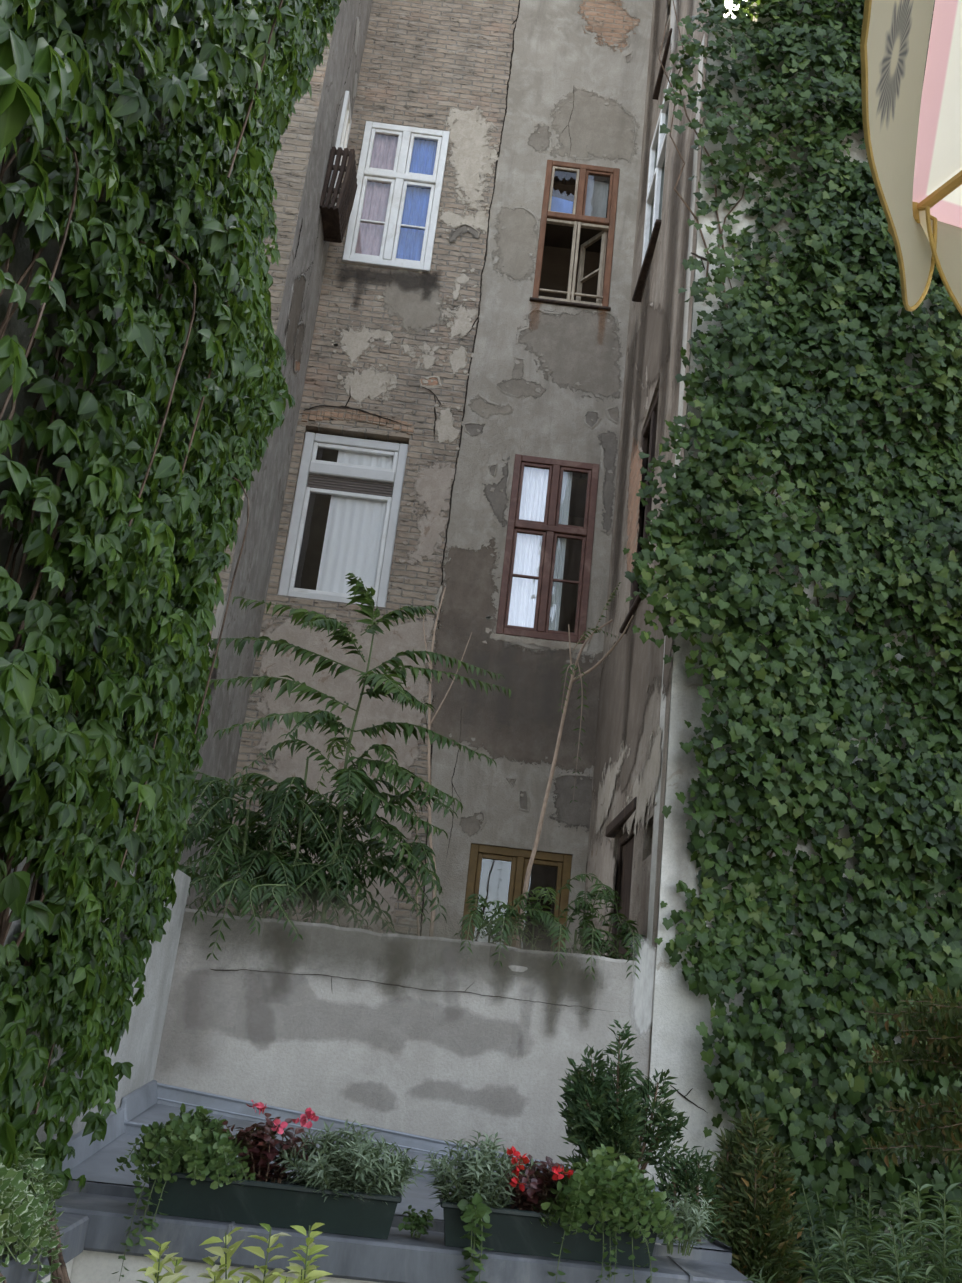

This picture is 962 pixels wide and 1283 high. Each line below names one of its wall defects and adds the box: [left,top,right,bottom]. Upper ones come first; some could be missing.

peeling [577,0,640,63]
peeling [527,88,640,163]
peeling [445,223,481,242]
peeling [434,301,671,572]
peeling [425,456,674,929]
crack [211,969,625,1013]